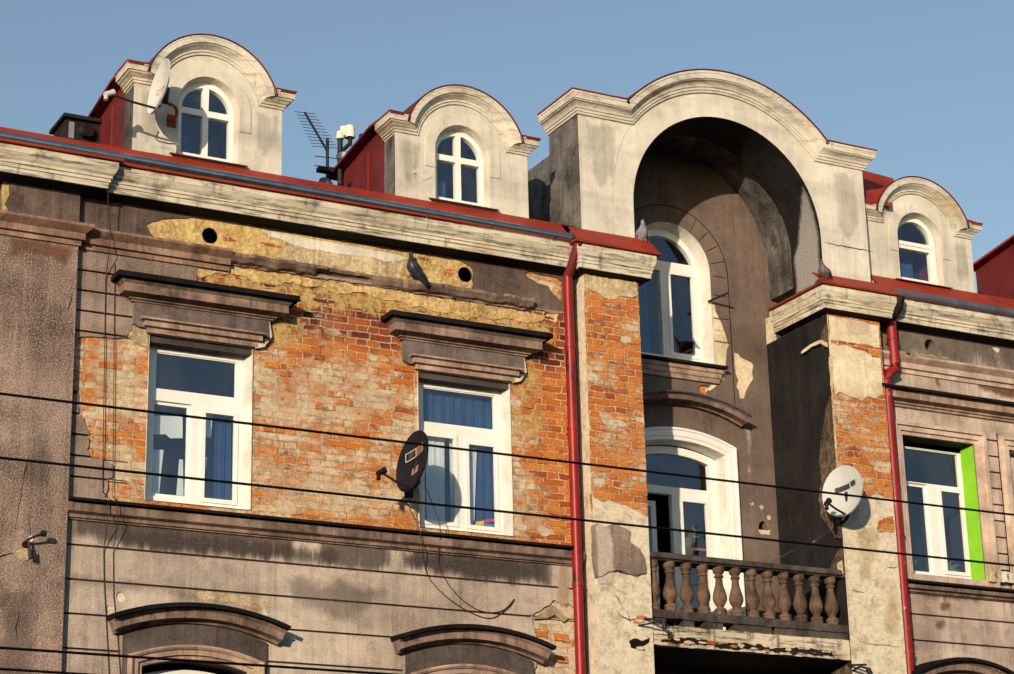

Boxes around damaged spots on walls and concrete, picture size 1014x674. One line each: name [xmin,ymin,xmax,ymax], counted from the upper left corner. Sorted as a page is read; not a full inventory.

flaking render [73,218,571,545]
flaking render [583,274,648,516]
peeling [698,303,753,399]
flaking render [801,314,894,580]
leakage [77,520,568,605]
spalling [629,637,833,656]
flaking render [829,665,853,674]